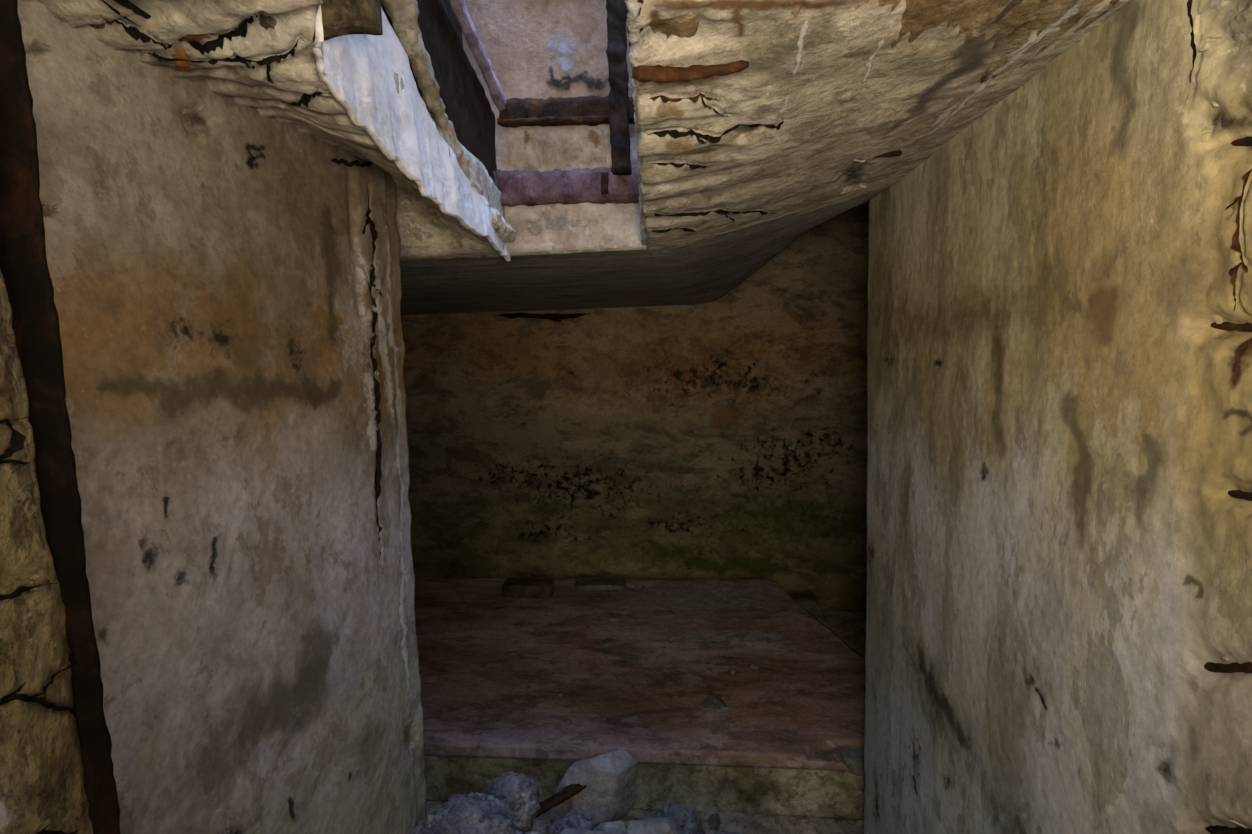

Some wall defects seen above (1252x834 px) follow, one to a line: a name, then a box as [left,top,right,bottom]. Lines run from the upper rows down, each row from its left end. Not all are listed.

flaking render [1188,0,1252,68]
spalling [381,0,517,243]
spalling [624,0,749,246]
crack [648,93,784,170]
spalling [847,150,902,188]
crack [652,209,778,233]
damp [608,342,823,407]
corrosion [1231,339,1252,387]
crack [0,416,33,464]
damp [720,420,855,498]
damp [474,448,667,541]
crack [0,661,75,711]